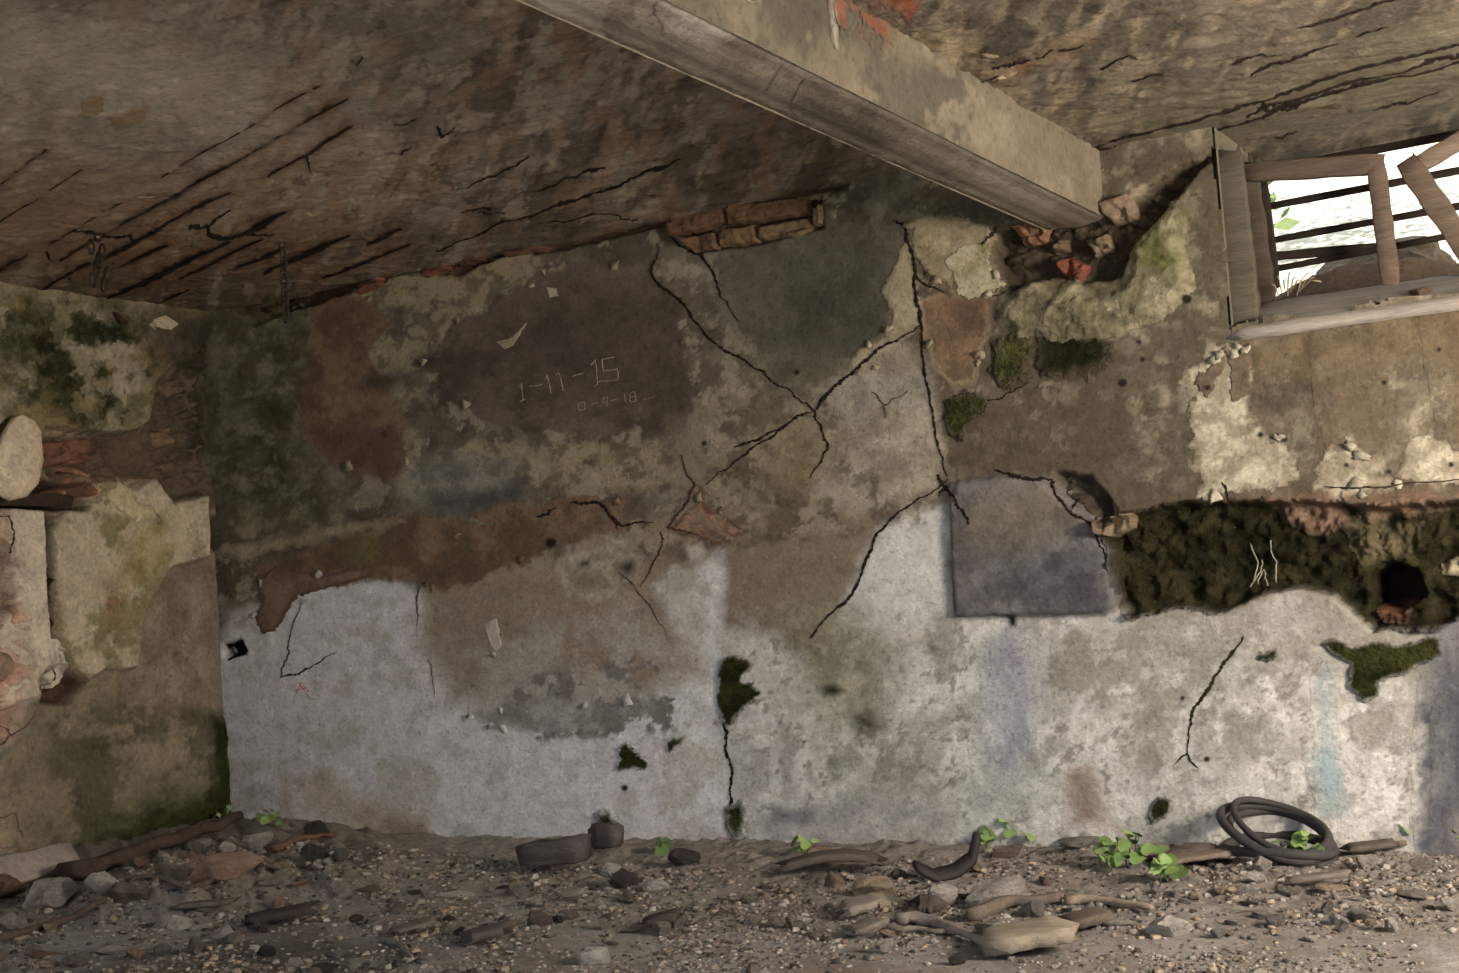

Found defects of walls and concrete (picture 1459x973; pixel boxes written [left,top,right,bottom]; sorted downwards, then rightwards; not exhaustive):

crack [1097,0,1459,151]
spalling [854,160,1207,387]
spalling [0,381,199,524]
damp [92,297,539,629]
crack [436,156,970,638]
spalling [1065,337,1459,634]
spalling [0,534,90,752]
damp [47,750,214,846]
spalling [118,490,749,728]
crack [722,723,734,805]
crack [1175,636,1244,768]
damp [1408,621,1459,856]